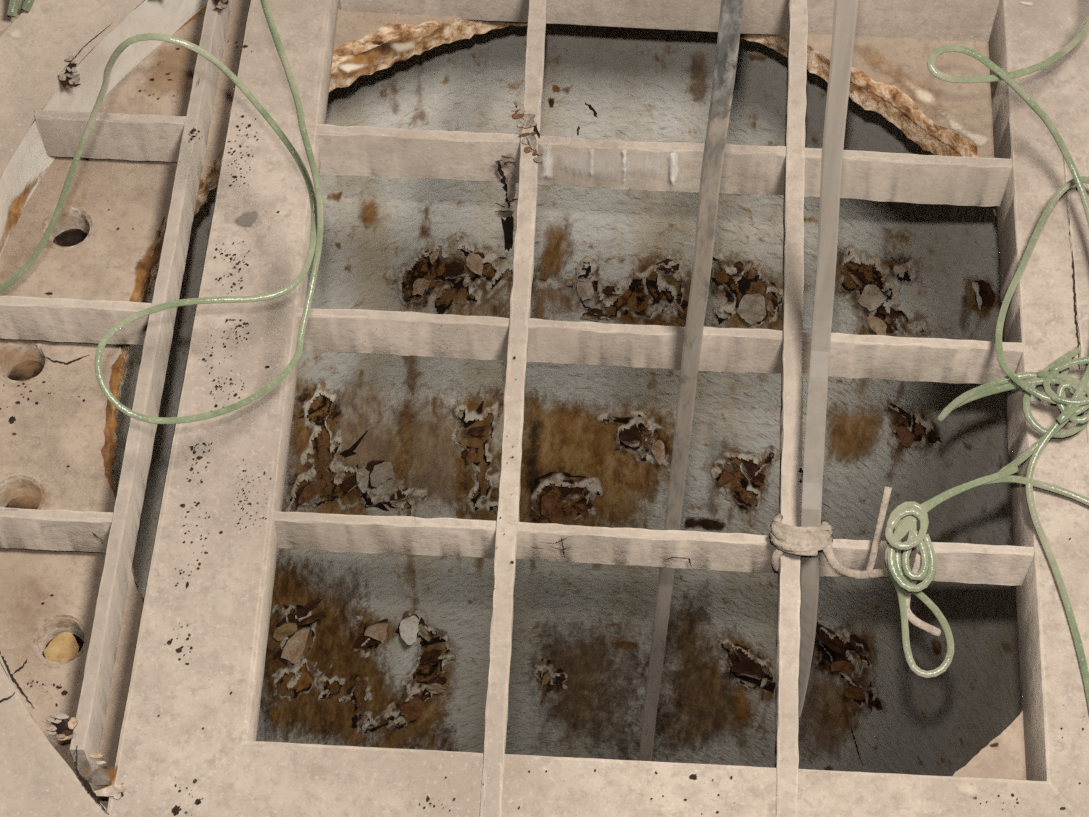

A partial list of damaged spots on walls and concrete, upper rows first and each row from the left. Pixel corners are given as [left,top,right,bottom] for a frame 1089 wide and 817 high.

corrosion [331,21,441,74]
corrosion [850,67,988,157]
peeling [385,100,542,326]
peeling [531,248,691,327]
peeling [710,249,783,331]
peeling [835,245,930,338]
corrosion [101,354,123,492]
peeling [281,381,428,517]
peeling [451,399,524,521]
corrosion [519,393,675,528]
peeling [711,445,779,522]
peeling [272,592,458,749]